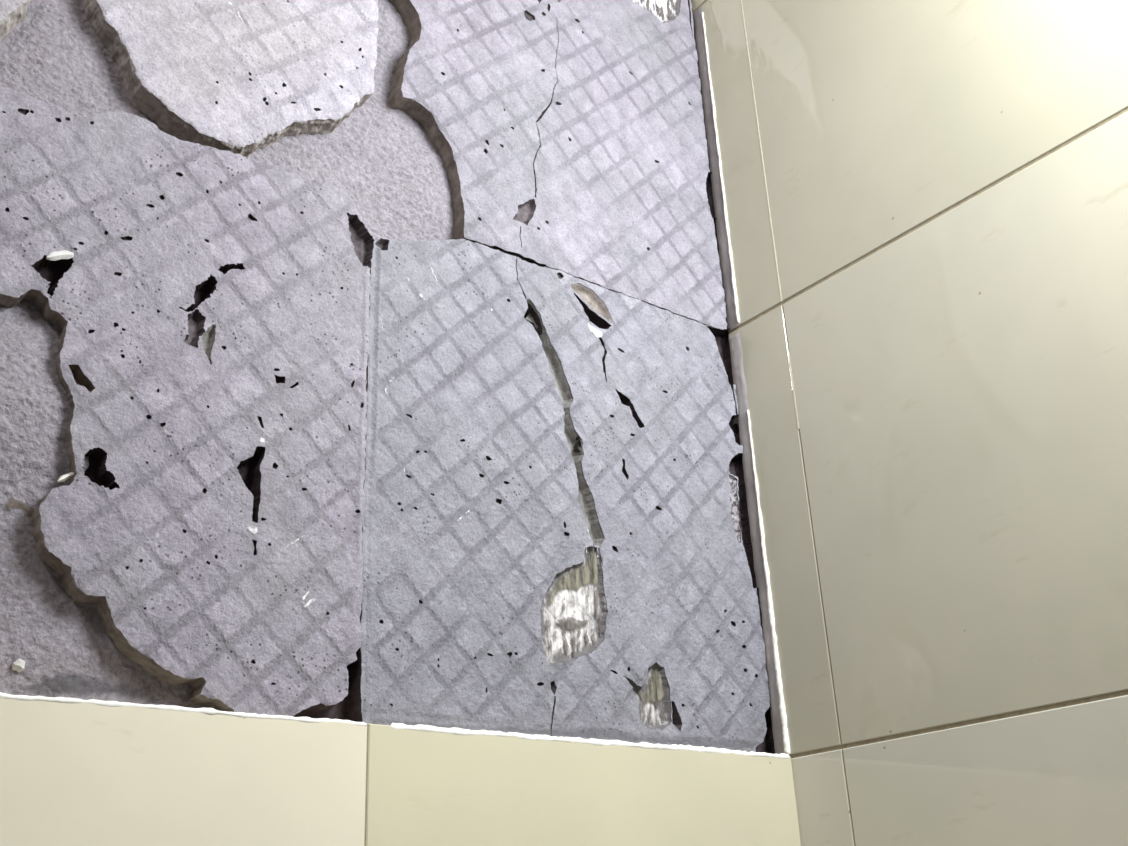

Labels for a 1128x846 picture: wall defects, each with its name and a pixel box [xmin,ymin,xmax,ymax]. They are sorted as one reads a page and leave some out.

spalling [0,0,163,131]
spalling [247,0,454,268]
crack [533,46,558,197]
spalling [46,242,84,261]
crack [469,226,705,546]
spalling [0,300,208,708]
spalling [540,531,618,666]
spalling [611,663,684,731]